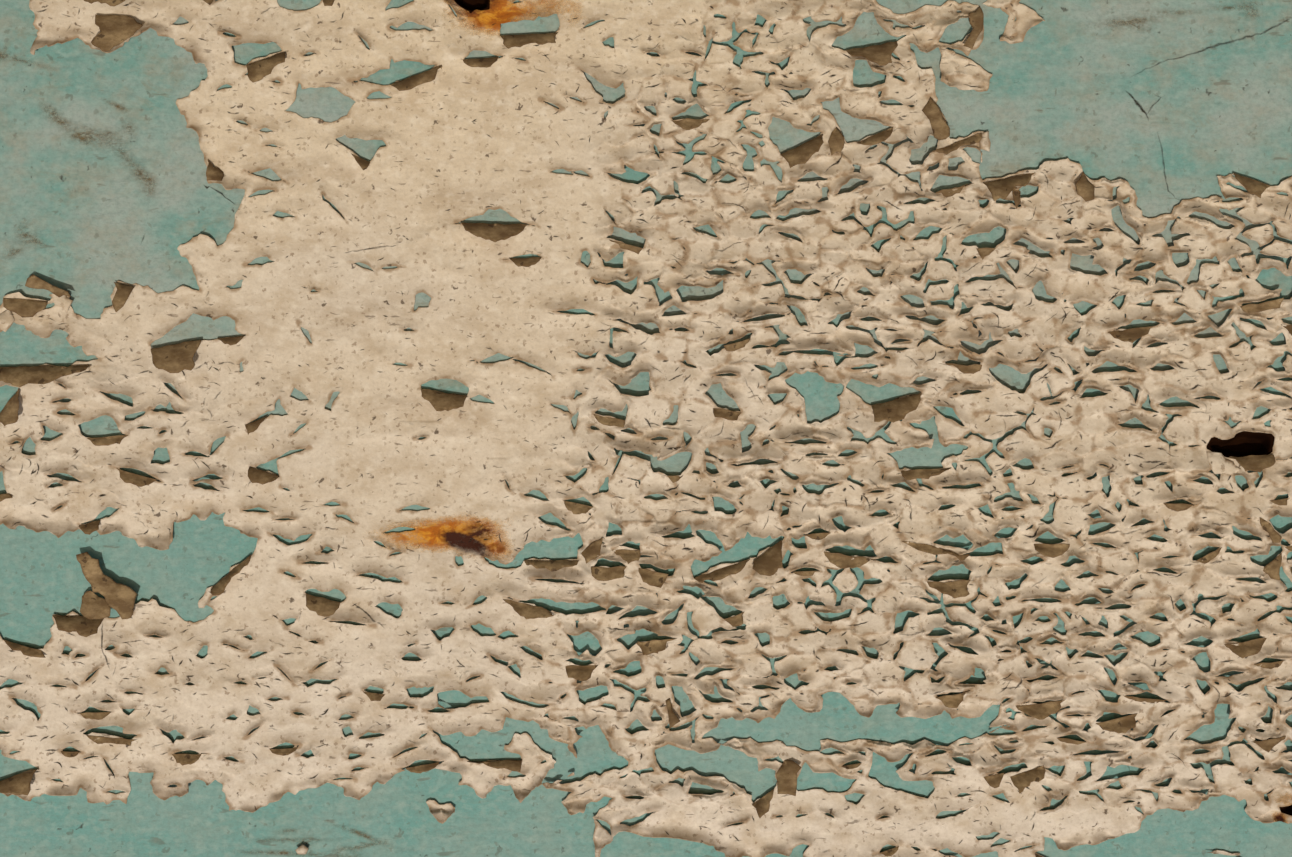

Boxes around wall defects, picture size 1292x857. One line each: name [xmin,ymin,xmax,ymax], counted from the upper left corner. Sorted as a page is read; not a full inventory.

corrosion [446,0,569,32]
peeling [565,57,633,112]
peeling [646,100,713,140]
peeling [594,159,659,191]
peeling [736,0,1292,403]
peeling [0,0,571,666]
corrosion [389,517,510,558]
peeling [0,223,1292,857]